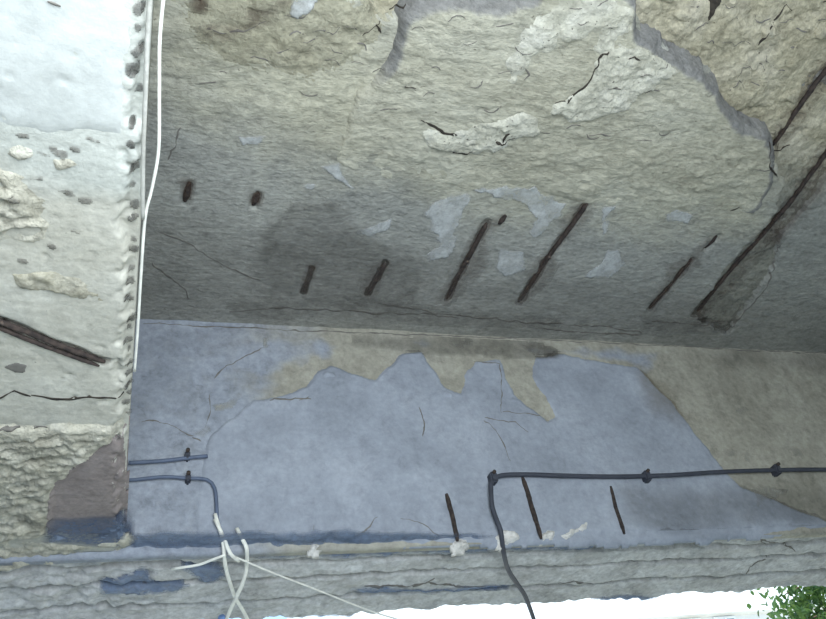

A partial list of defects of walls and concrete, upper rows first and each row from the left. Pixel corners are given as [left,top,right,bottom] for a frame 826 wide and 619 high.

spalling [126,42,144,91]
peeling [171,0,399,83]
spalling [183,181,191,202]
peeling [423,112,541,155]
spalling [505,0,826,331]
spalling [445,222,488,300]
crack [0,390,124,401]
crack [0,424,47,432]
spalling [0,359,136,571]
spalling [445,493,470,557]
spalling [521,477,587,547]
spalling [610,486,626,534]